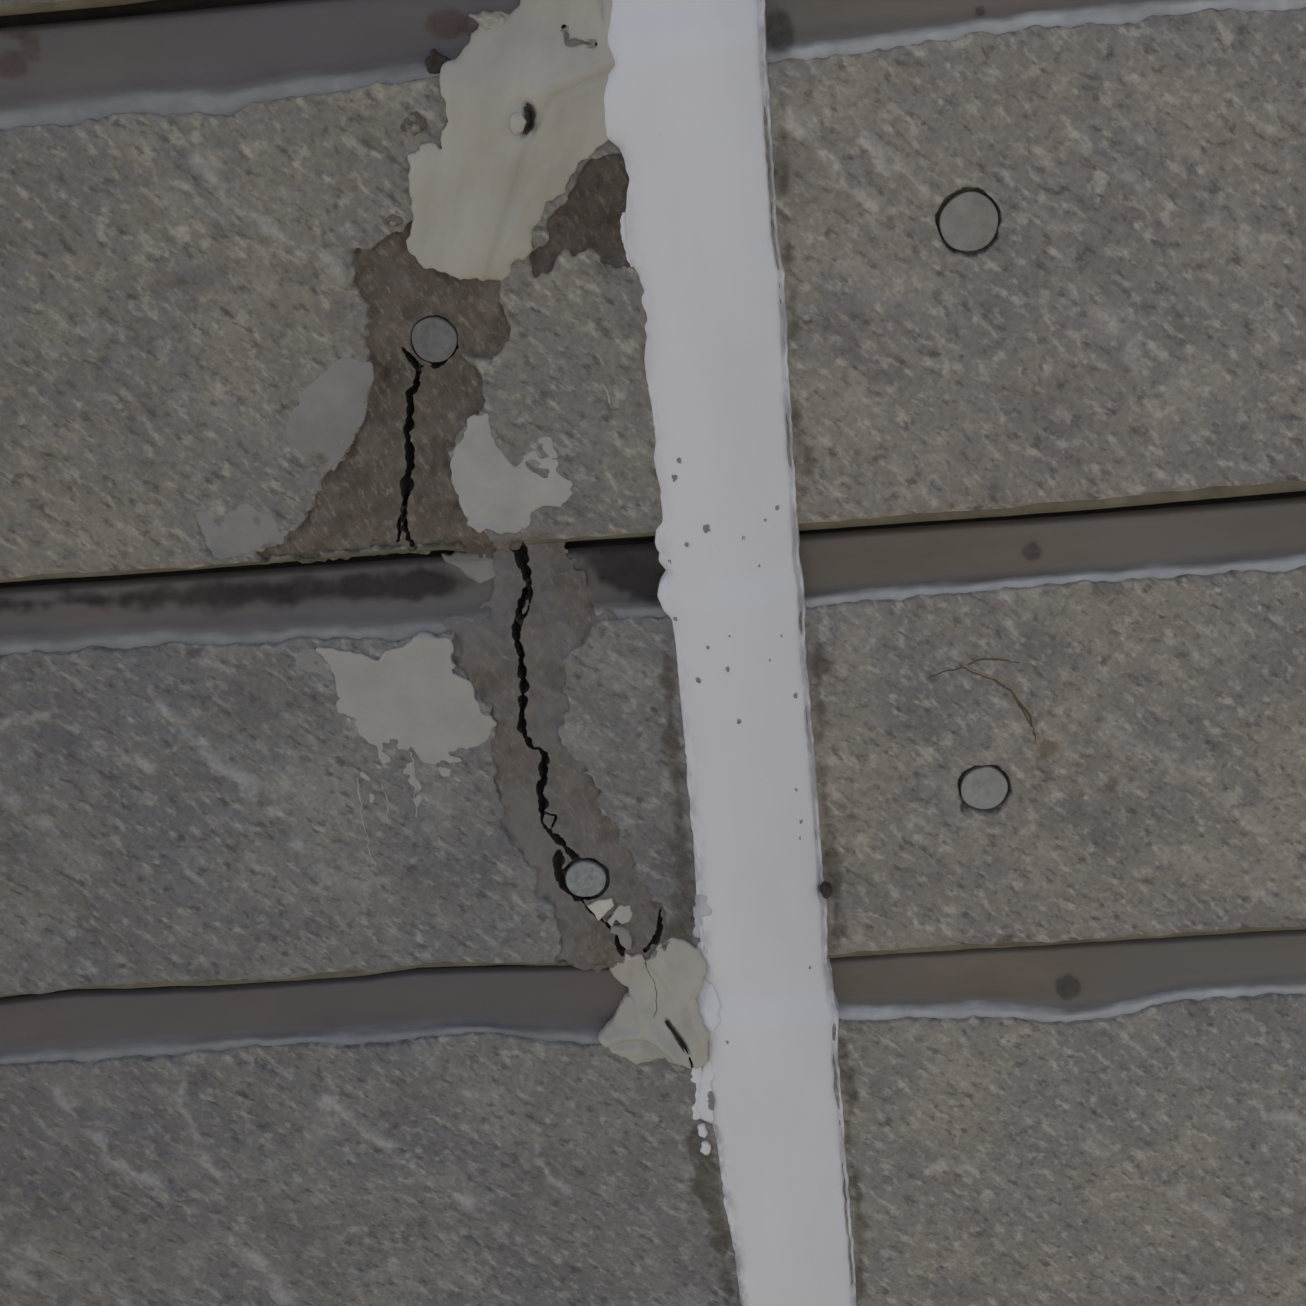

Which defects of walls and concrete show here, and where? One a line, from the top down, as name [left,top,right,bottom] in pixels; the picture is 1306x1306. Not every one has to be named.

crack [396,345,459,545]
spalling [195,222,667,973]
spalling [530,153,631,277]
crack [511,543,694,1068]